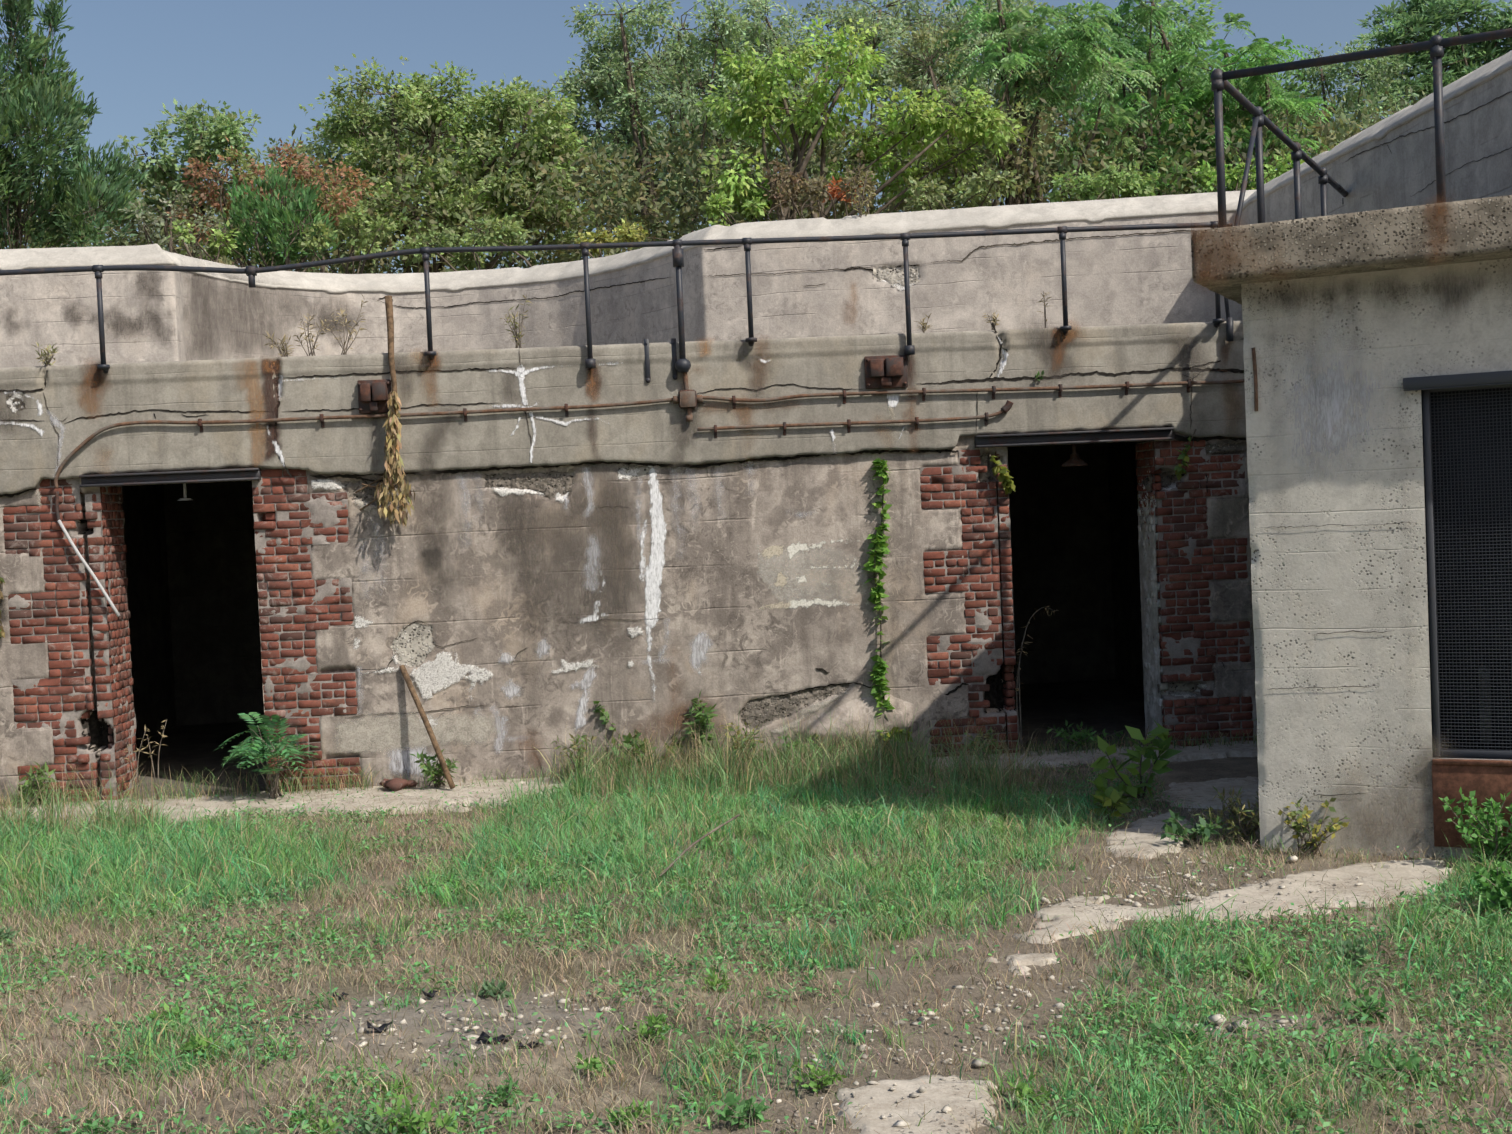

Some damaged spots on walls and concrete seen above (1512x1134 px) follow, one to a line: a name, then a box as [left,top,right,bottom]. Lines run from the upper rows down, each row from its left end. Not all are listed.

crack [707,230,1195,286]
crack [373,277,668,309]
rust [85,363,103,403]
rust [248,359,280,459]
leakage [489,365,599,463]
spalling [976,453,1001,483]
spalling [1205,442,1247,455]
leakage [507,466,667,699]
spalling [81,710,114,752]
peeling [337,623,519,774]
spalling [737,684,851,734]
spalling [984,663,1020,713]